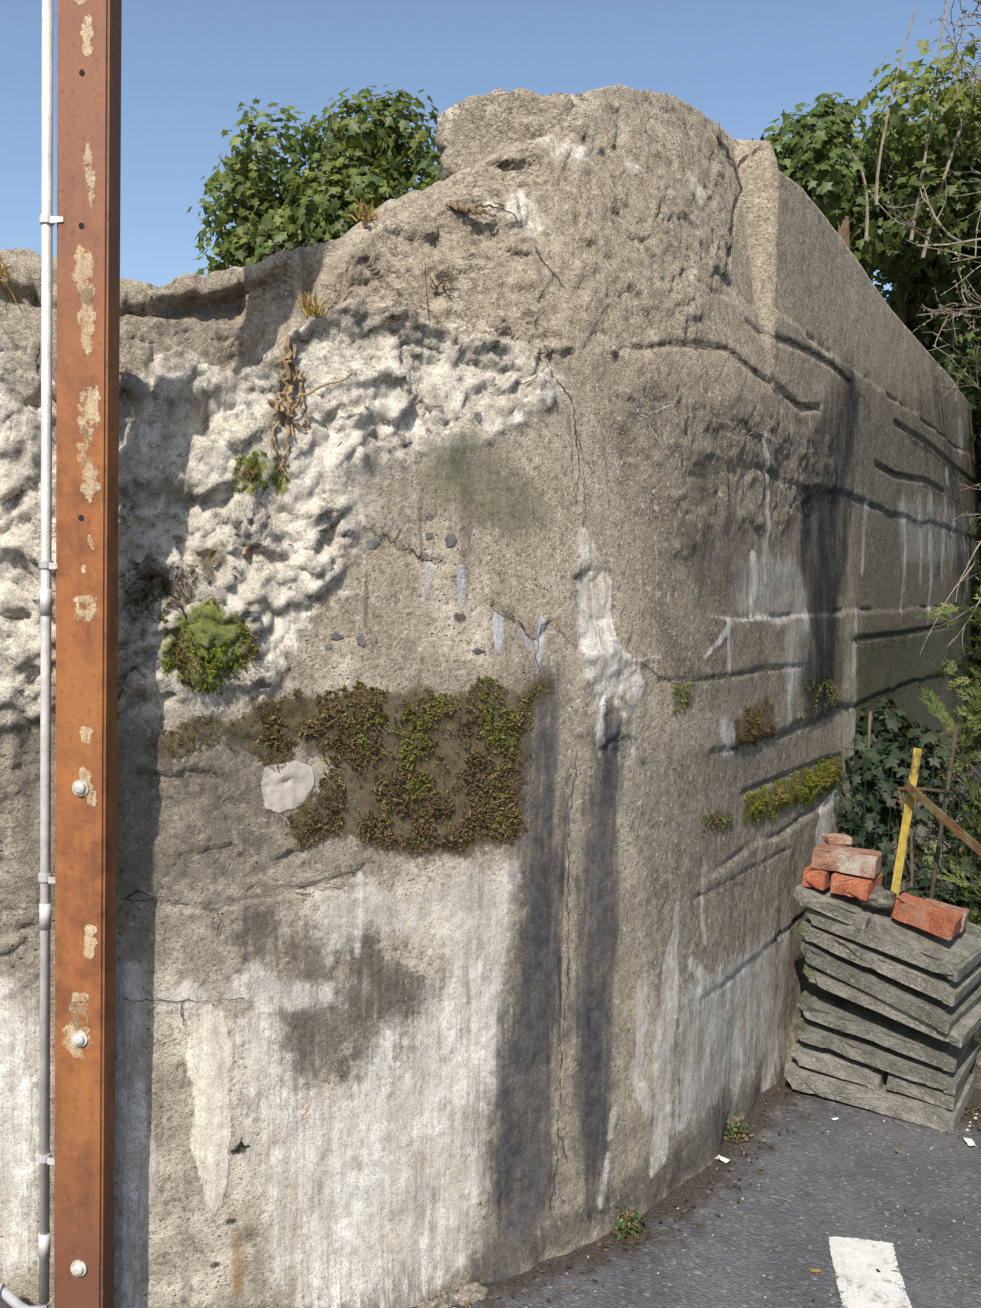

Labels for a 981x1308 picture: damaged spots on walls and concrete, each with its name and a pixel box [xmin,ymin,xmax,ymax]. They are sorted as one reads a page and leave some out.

crack [711,123,762,286]
crack [516,345,591,531]
crack [607,322,979,516]
water stain [801,360,867,845]
water stain [901,495,970,613]
water stain [474,530,790,1283]
water stain [272,913,425,1095]